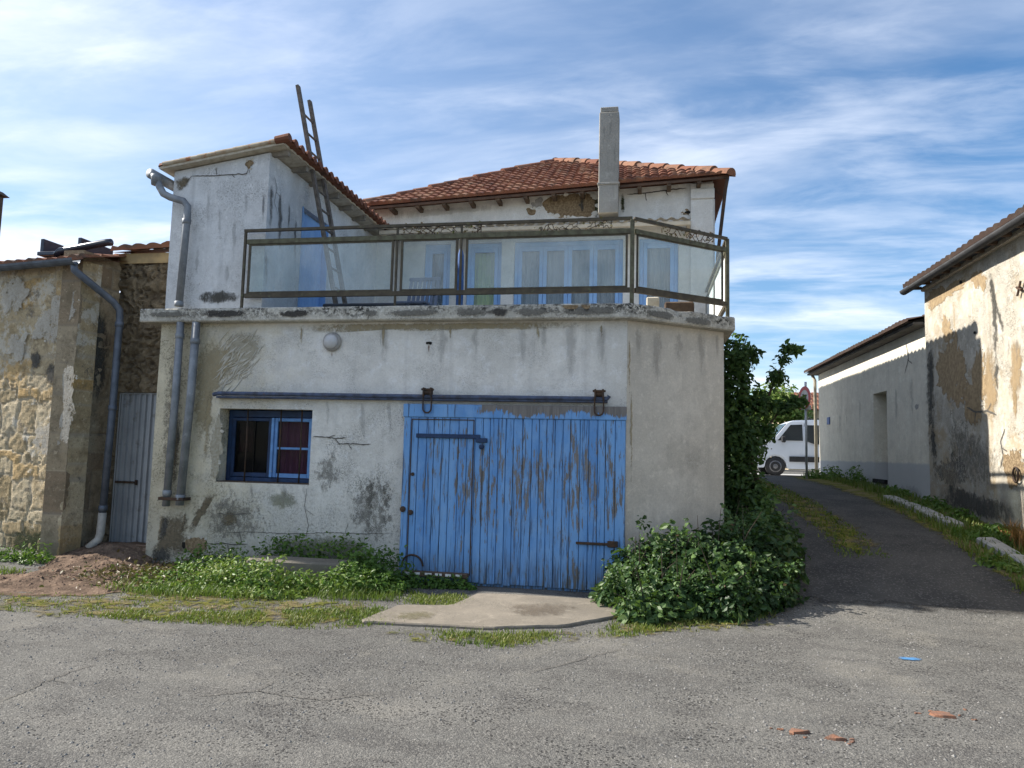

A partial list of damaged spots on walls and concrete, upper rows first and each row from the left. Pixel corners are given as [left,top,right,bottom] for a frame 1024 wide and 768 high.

crack [187,170,248,181]
spalling [526,192,598,218]
damp [201,291,236,303]
spalling [925,269,987,425]
damp [927,350,937,472]
crack [314,435,369,448]
damp [944,485,1008,522]
damp [152,496,212,561]